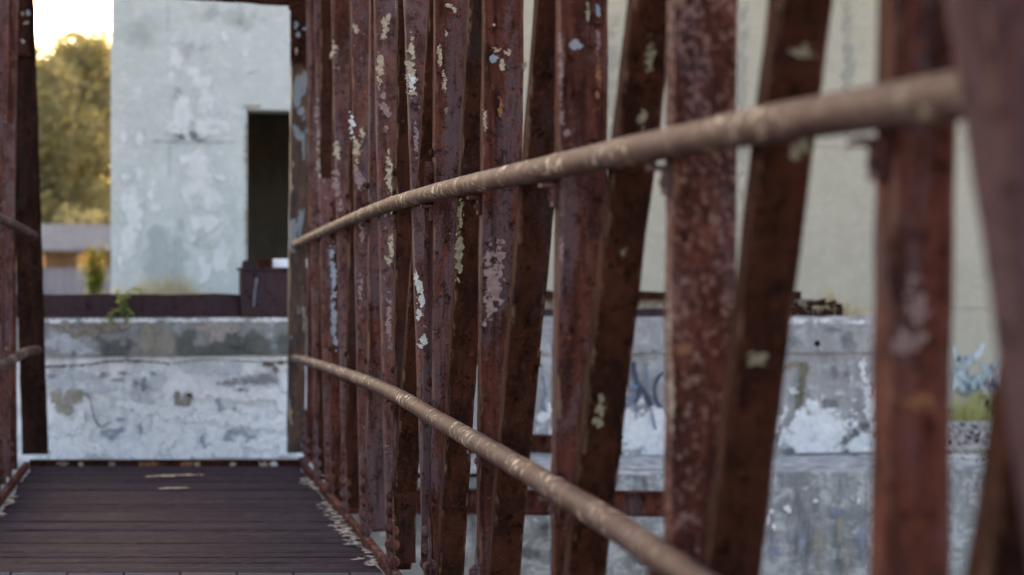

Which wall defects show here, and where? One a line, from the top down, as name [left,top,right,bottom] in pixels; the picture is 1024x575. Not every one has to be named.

peeling [375,13,392,132]
peeling [404,32,419,96]
peeling [436,30,448,93]
peeling [489,47,511,71]
peeling [313,96,366,212]
peeling [384,148,393,197]
peeling [329,241,338,352]
peeling [414,268,426,321]
peeling [481,238,507,327]
corrosion [792,298,842,317]
spalling [50,388,84,416]
leakage [45,317,290,459]